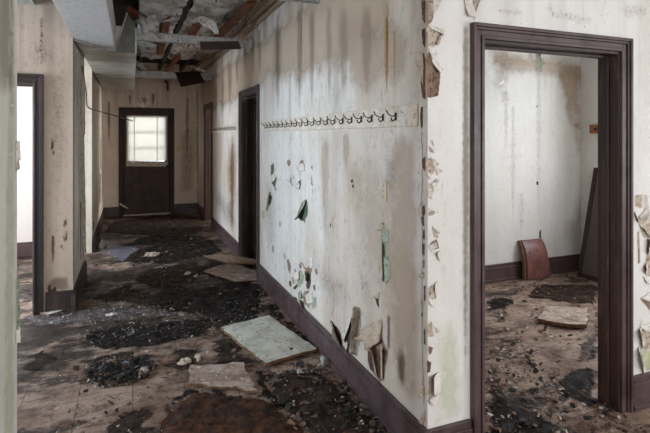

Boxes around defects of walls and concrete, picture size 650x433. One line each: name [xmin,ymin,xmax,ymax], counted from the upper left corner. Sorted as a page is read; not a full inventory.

damp [203,0,403,112]
peeling [416,0,445,129]
damp [495,54,581,113]
damp [217,144,234,222]
peeling [262,163,277,219]
peeling [285,159,313,223]
peeling [284,253,318,309]
peeling [377,222,391,284]
peeling [416,141,443,278]
peeling [635,194,650,285]
peeling [330,306,388,382]
peeling [419,321,442,406]